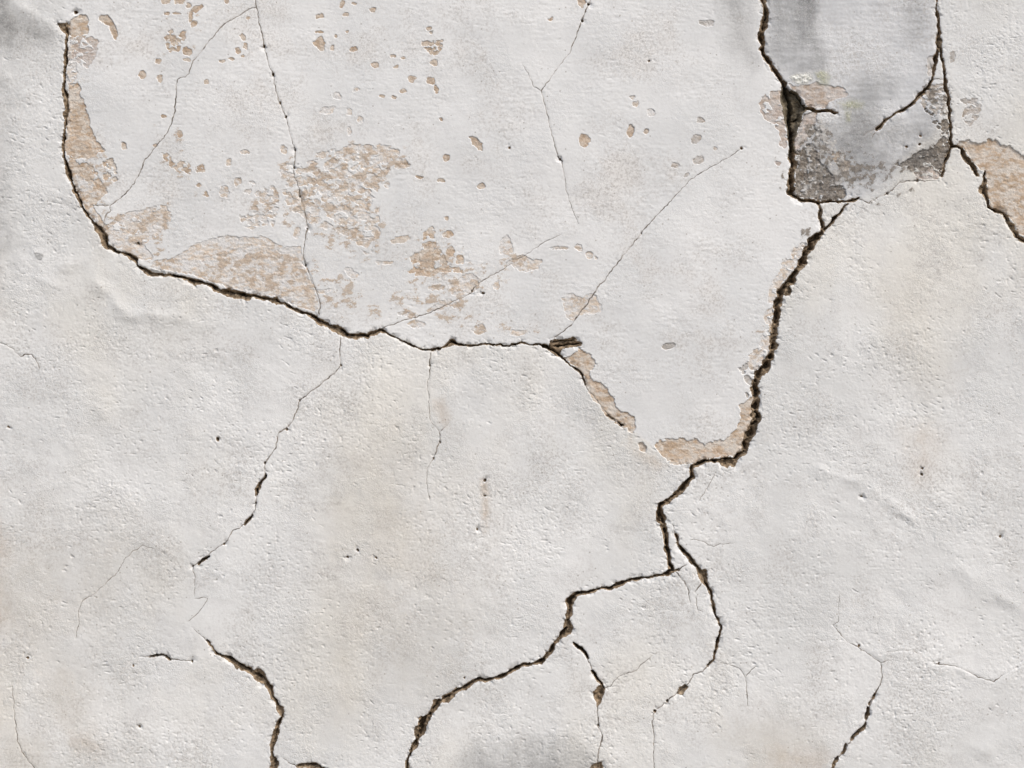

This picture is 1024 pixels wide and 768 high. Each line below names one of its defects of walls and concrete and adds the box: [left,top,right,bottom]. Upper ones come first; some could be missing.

peeling [65,0,542,335]
spalling [758,56,1024,235]
crack [57,0,743,768]
peeling [561,227,811,465]
crack [405,0,1024,768]